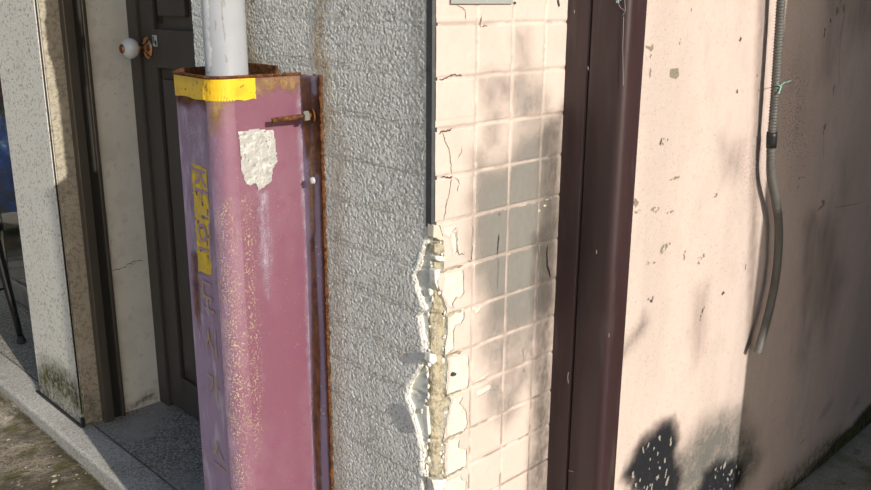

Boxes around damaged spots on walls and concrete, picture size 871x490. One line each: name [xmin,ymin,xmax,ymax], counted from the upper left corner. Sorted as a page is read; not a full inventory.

corrosion [172,66,334,490]
spalling [408,224,492,490]
crack [440,128,473,262]